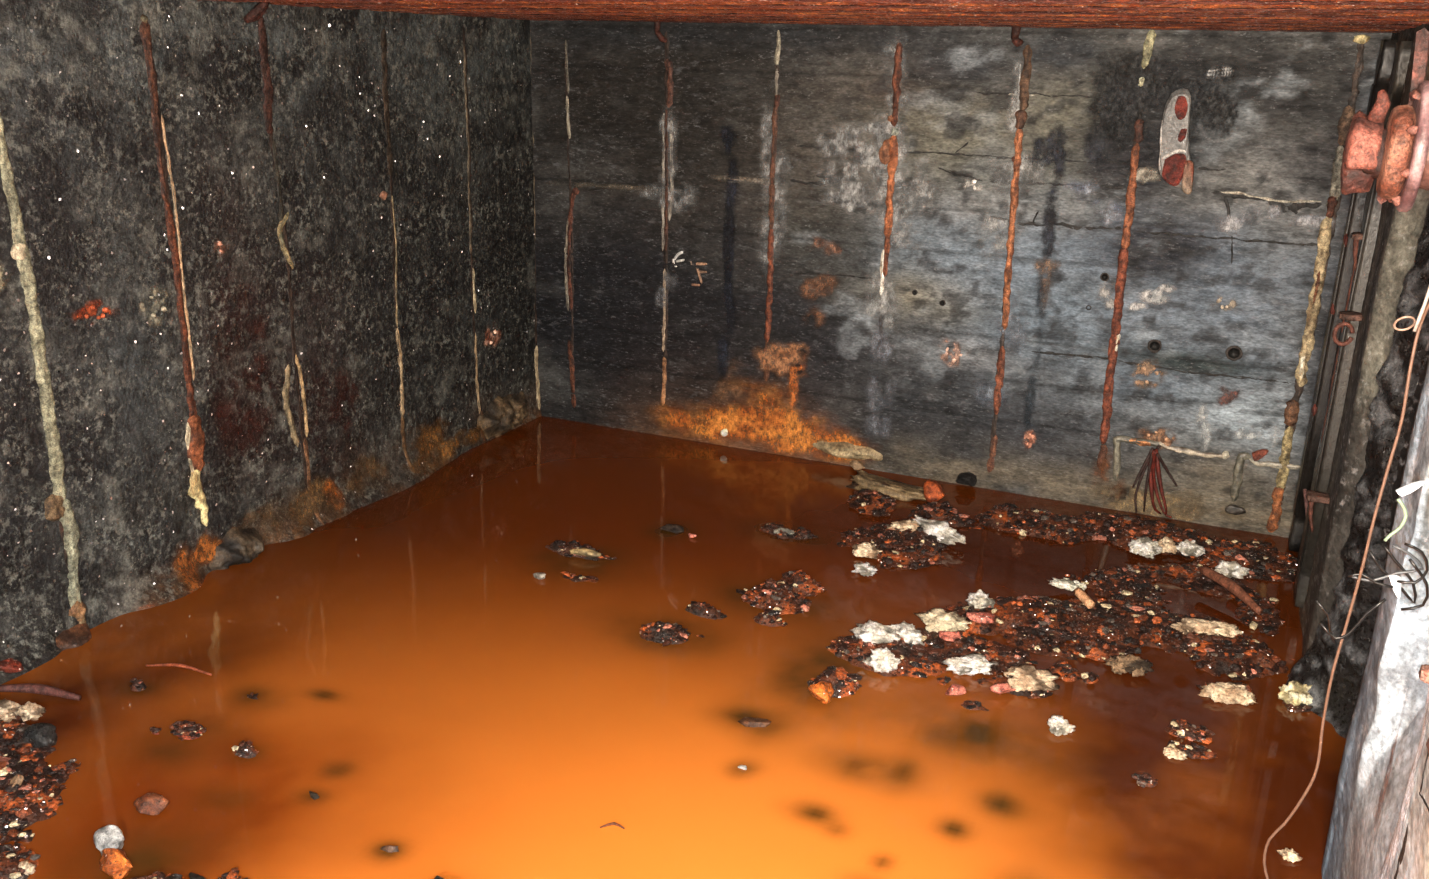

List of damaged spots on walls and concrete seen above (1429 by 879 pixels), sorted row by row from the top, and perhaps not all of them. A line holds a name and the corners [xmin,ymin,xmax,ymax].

damp [578,117,690,208]
corrosion [665,344,861,460]